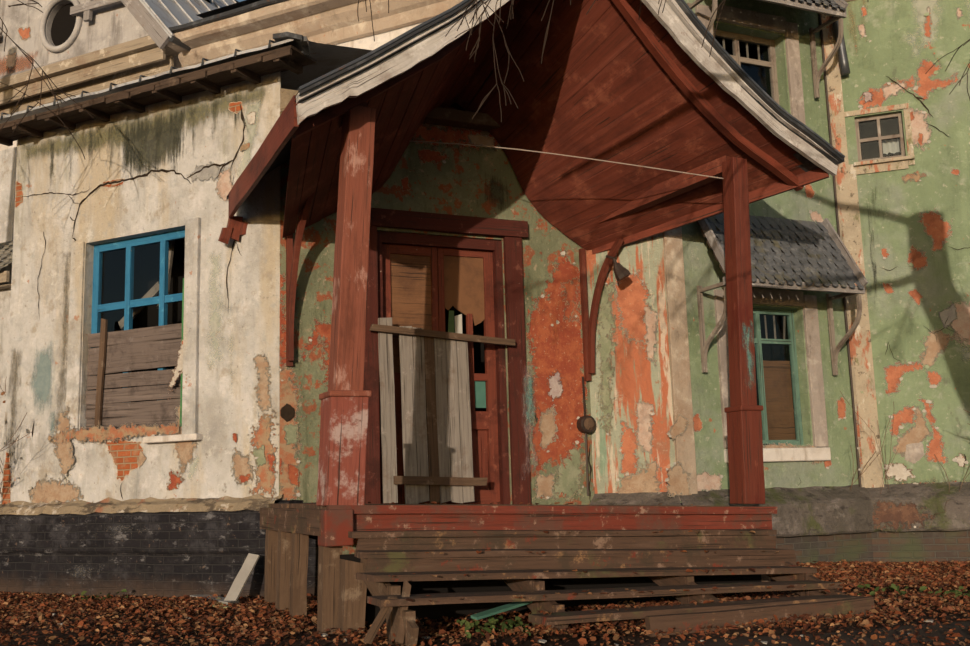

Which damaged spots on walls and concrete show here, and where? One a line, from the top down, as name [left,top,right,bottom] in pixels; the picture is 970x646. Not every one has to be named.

crack [21,105,247,241]
damp [110,109,194,172]
peeling [856,58,964,151]
crack [226,240,241,303]
peeling [906,205,953,273]
peeling [28,406,93,503]
flaking render [105,434,155,482]
peeling [166,340,199,491]
spalling [230,274,331,502]
peeling [524,248,588,502]
spalling [606,400,723,497]
peeling [884,396,969,485]